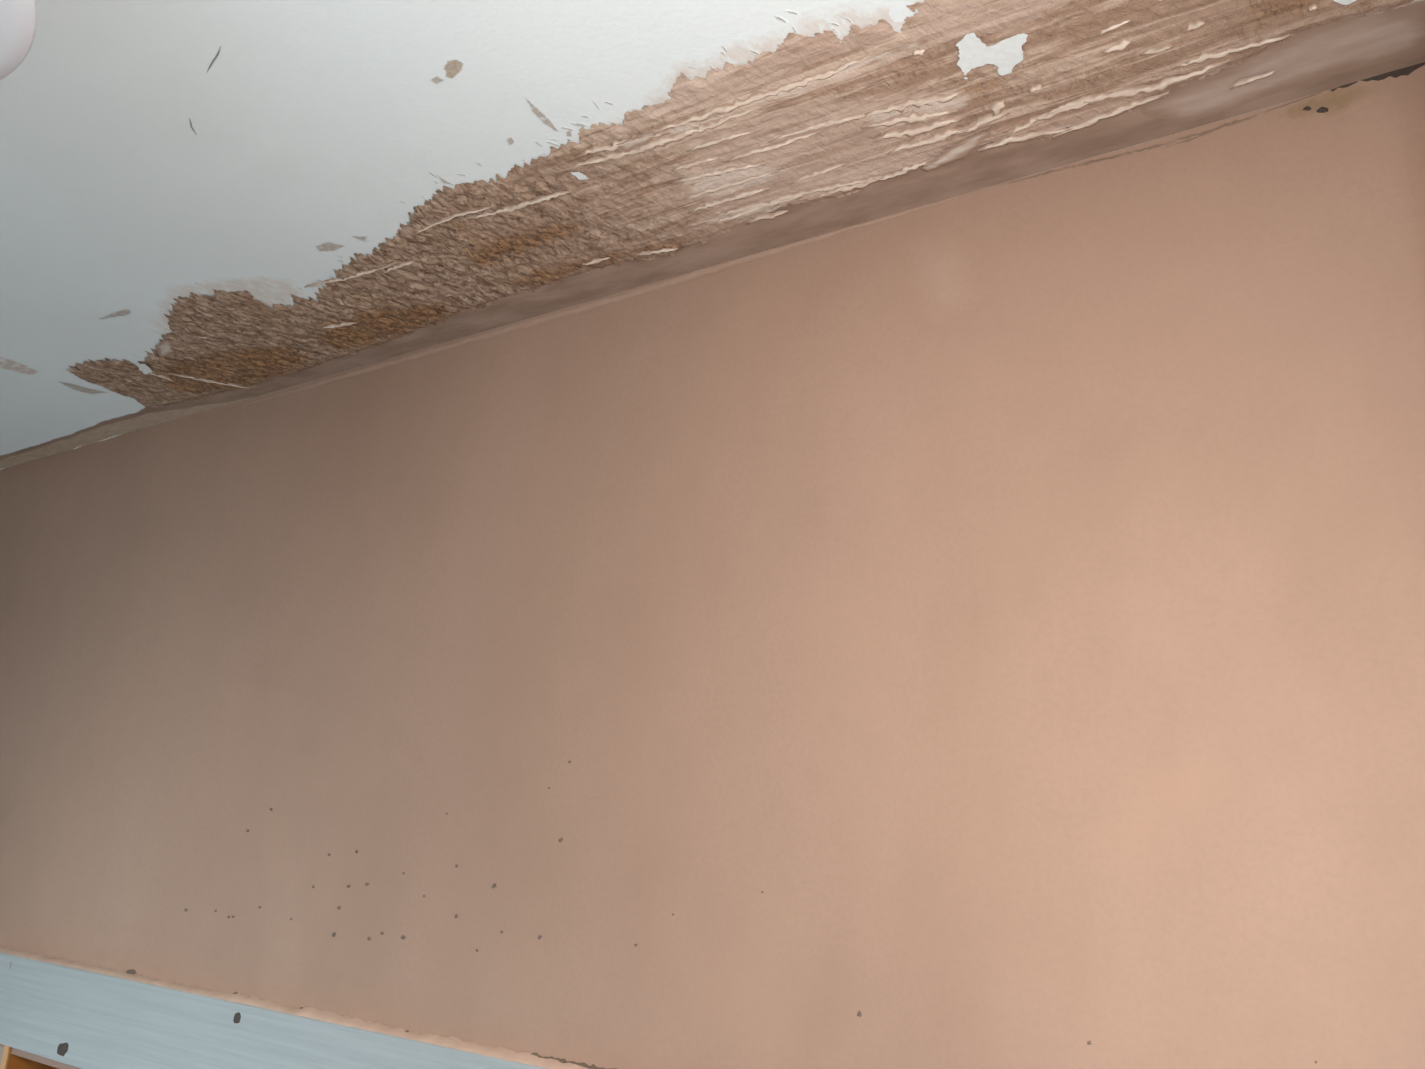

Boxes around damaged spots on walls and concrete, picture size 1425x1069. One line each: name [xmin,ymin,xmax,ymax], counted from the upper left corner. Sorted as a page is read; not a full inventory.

peeling [68,0,1418,408]